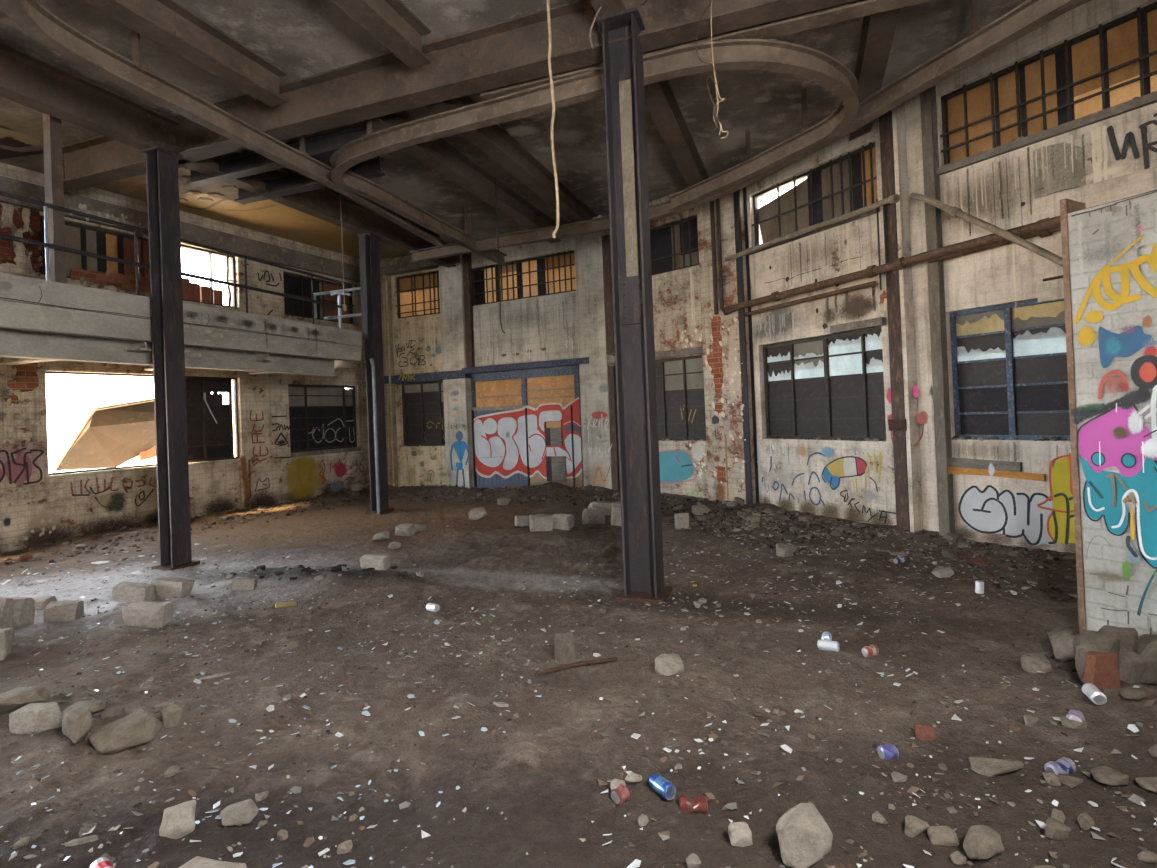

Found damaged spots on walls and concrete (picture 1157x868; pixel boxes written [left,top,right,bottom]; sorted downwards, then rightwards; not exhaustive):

flaking render [0,203,43,277]
damp [944,126,1127,271]
flaking render [7,362,42,408]
flaking render [680,310,796,503]